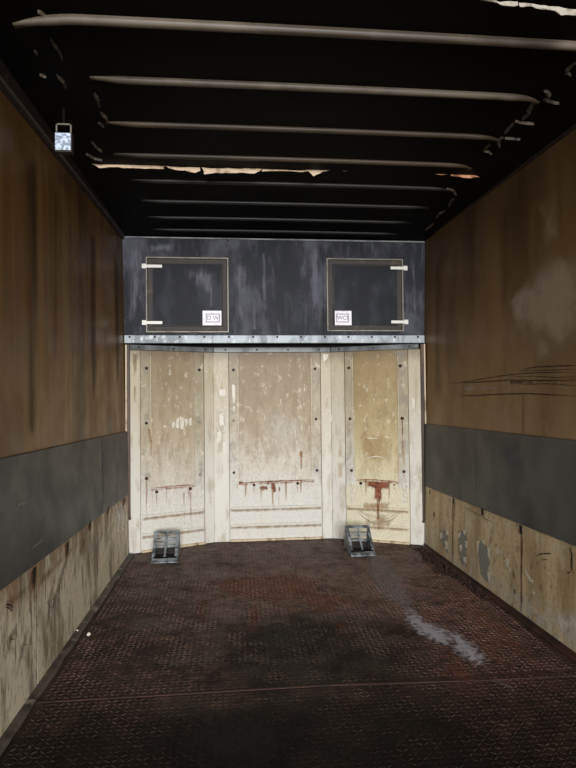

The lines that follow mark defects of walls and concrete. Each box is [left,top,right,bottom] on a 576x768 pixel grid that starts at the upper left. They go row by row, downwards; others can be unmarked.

peeling [481,0,576,16]
peeling [483,90,559,155]
peeling [86,142,330,176]
rust [239,480,303,492]
rust [359,479,397,519]
peeling [440,529,514,582]
damp [405,610,483,664]